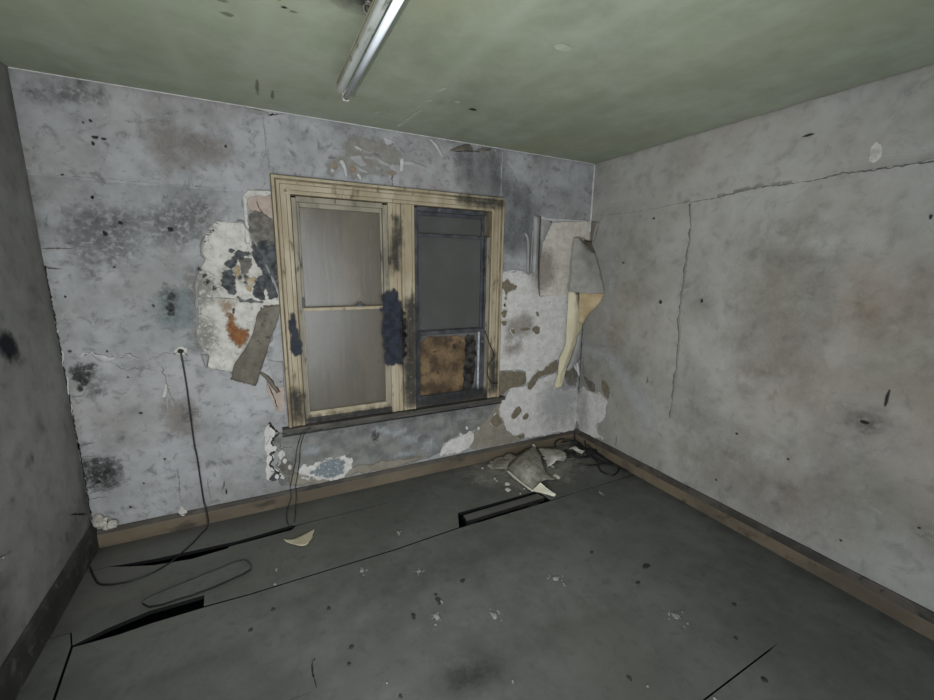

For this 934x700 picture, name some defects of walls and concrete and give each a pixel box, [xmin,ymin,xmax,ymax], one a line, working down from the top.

flaking render [197,189,279,371]
corrosion [222,301,250,348]
damp [69,364,94,391]
flaking render [270,229,610,485]
damp [83,458,115,489]